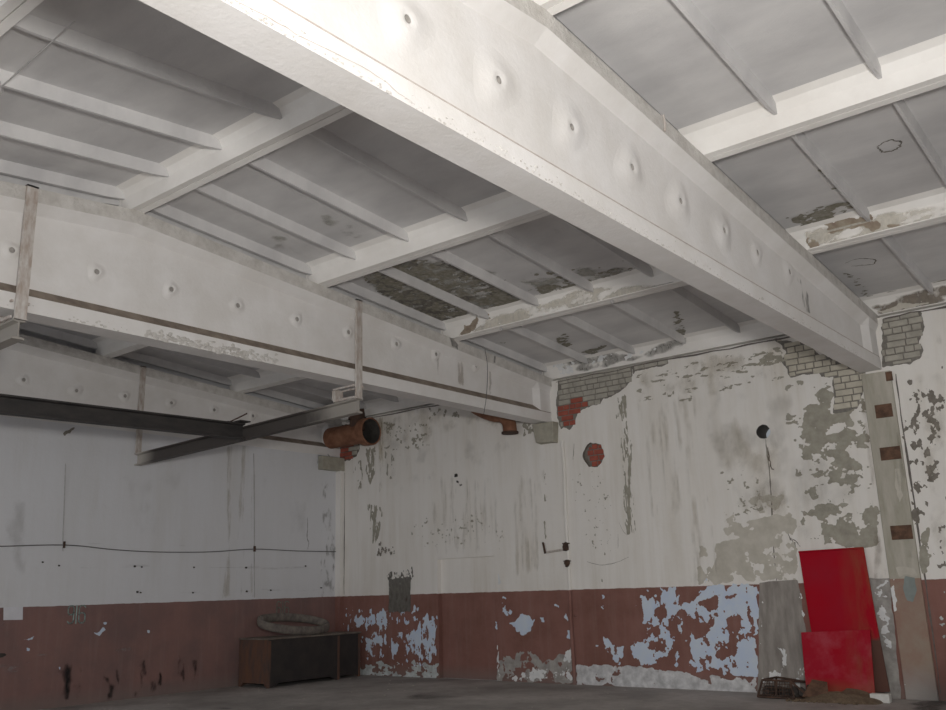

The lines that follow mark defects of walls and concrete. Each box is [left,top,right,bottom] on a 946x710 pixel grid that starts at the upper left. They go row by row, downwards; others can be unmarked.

peeling [806,214,900,248]
flaking render [877,301,929,367]
peeling [495,338,880,693]
flaking render [869,380,946,699]
peeling [343,605,439,678]